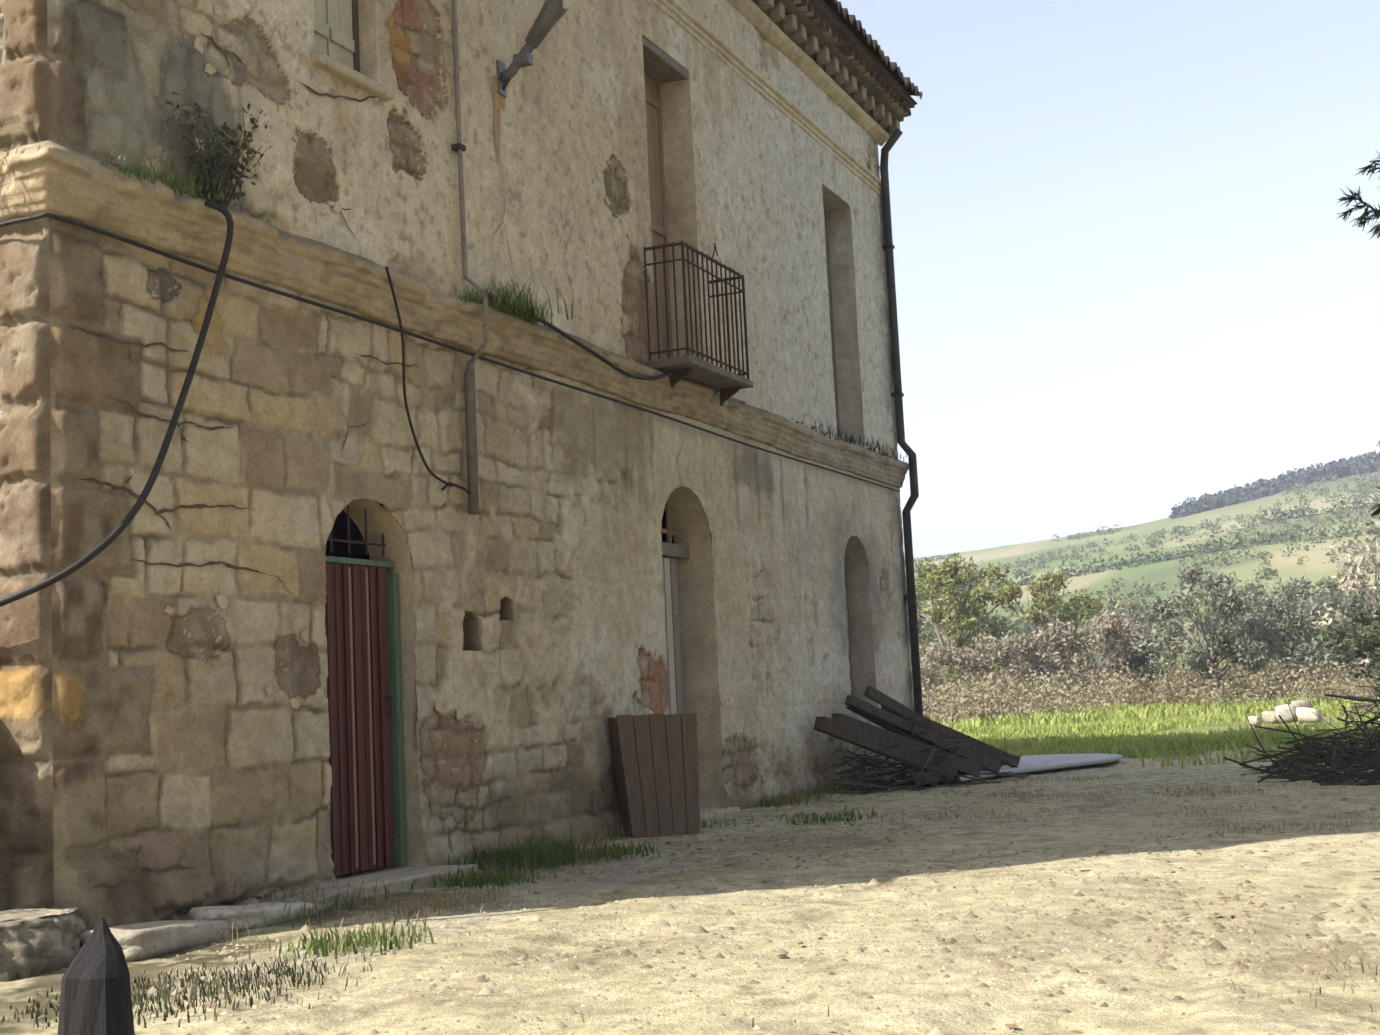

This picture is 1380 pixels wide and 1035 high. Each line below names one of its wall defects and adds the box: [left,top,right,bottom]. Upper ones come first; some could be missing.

peeling [66,0,301,162]
peeling [387,0,454,180]
peeling [292,129,341,214]
peeling [604,154,656,367]
peeling [635,641,667,714]